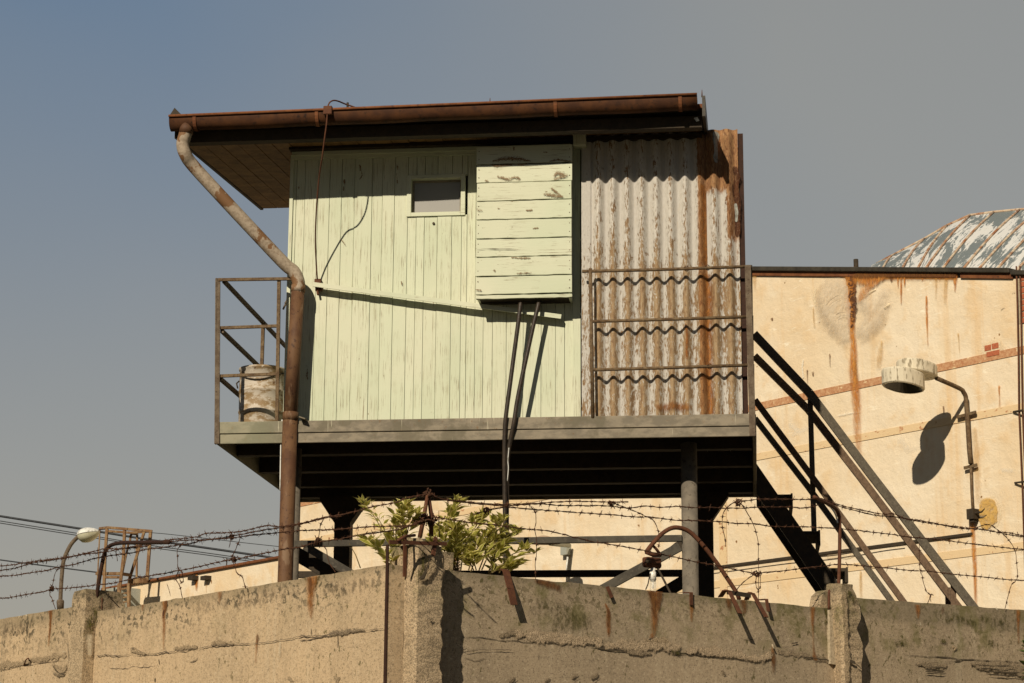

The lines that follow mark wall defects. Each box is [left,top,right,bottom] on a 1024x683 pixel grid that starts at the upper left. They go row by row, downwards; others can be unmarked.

peeling [543,152,571,198]
corrosion [732,167,741,237]
corrosion [700,184,714,414]
corrosion [845,273,957,434]
corrosion [657,403,689,411]
corrosion [308,576,319,609]
corrosion [649,591,662,637]
crack [97,628,383,681]
crack [462,636,627,661]
crack [649,638,769,661]